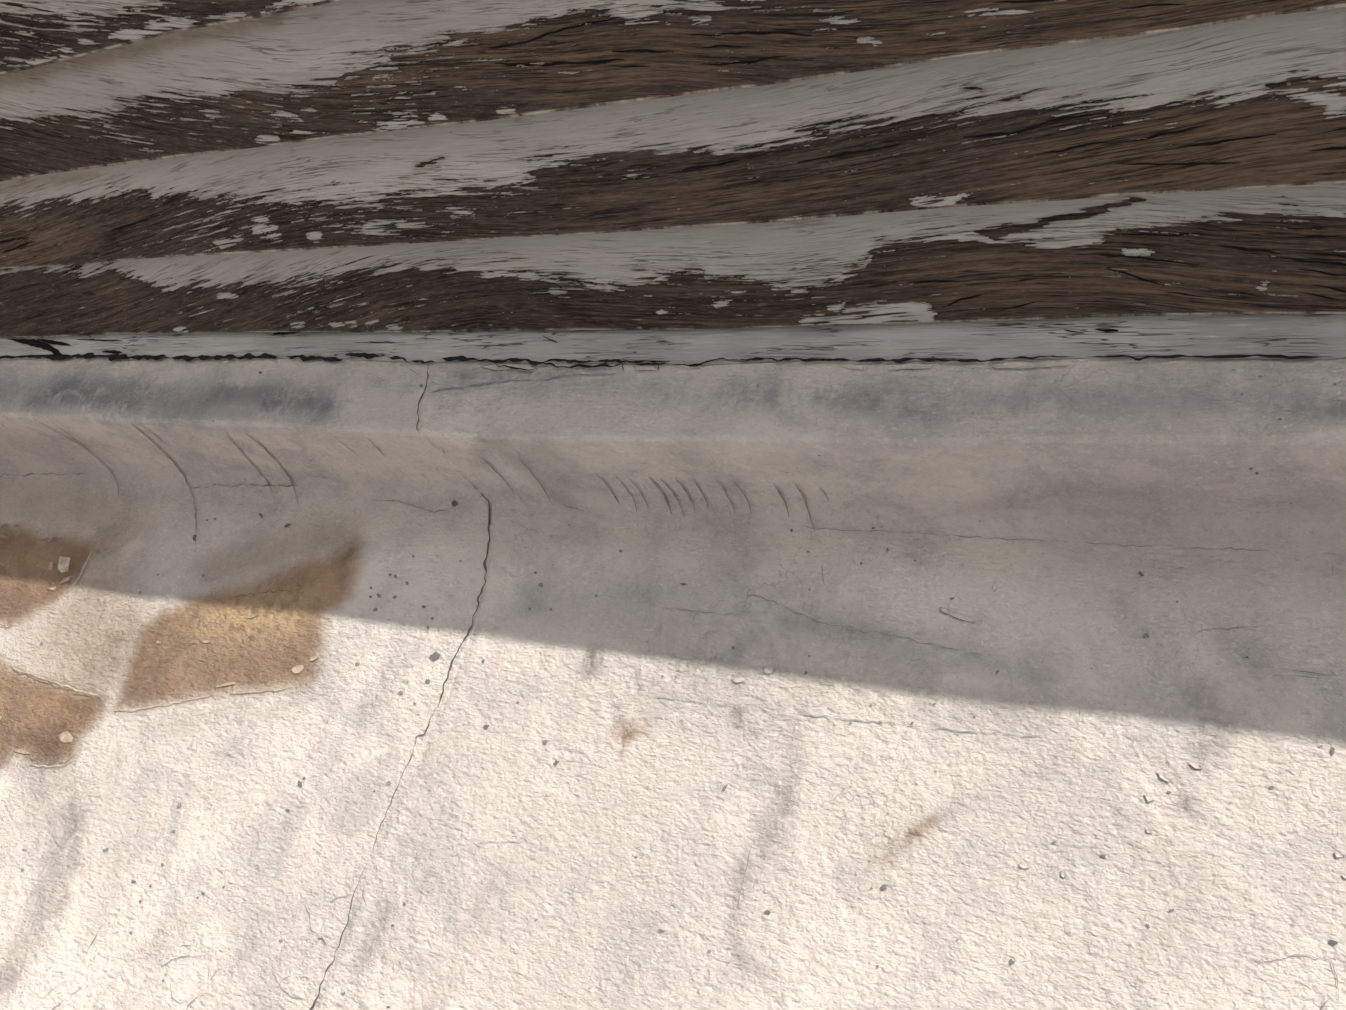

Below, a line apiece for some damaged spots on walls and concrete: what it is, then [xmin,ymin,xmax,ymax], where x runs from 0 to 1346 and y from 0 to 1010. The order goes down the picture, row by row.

peeling [0,0,1346,333]
crack [0,237,35,253]
crack [111,219,149,232]
crack [1102,233,1346,300]
peeling [989,362,1067,370]
spalling [47,550,101,591]
spalling [290,655,319,674]
crack [0,279,1346,1010]
spalling [9,666,286,713]
spalling [13,731,74,768]